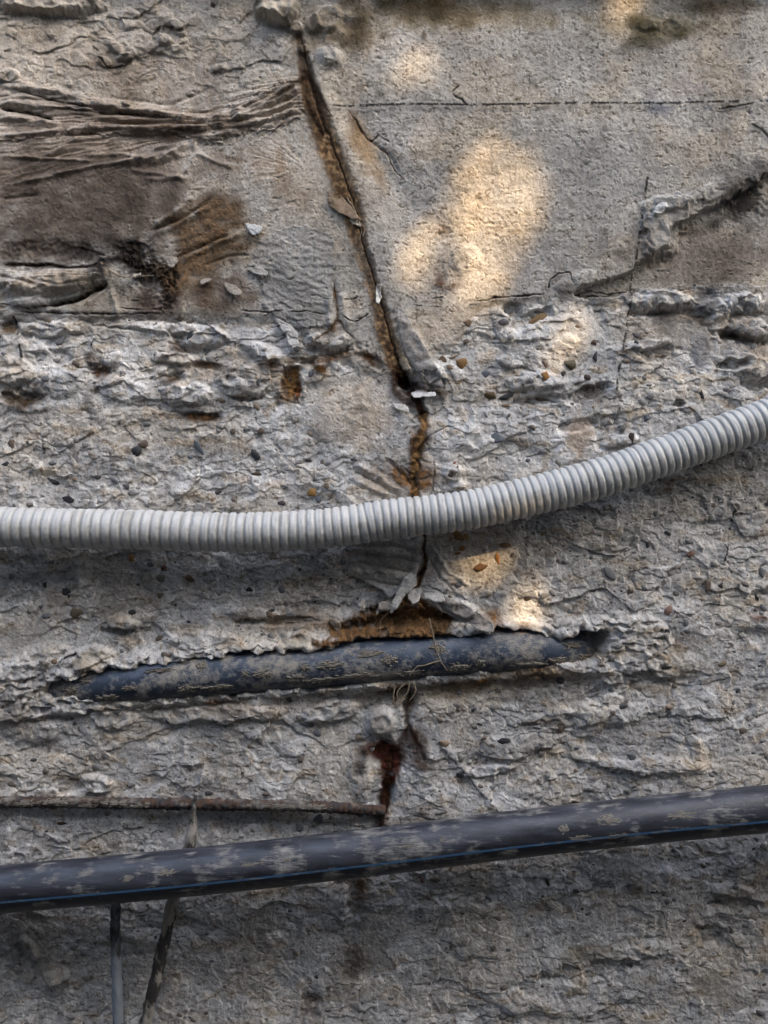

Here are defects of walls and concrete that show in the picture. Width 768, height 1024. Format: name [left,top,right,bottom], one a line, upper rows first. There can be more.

peeling [0,73,306,143]
spalling [0,223,383,431]
rust [309,352,378,372]
crack [244,45,446,498]
spalling [392,174,768,426]
rust [393,467,434,494]
crack [413,534,427,589]
spalling [47,632,321,679]
rust [0,729,428,827]